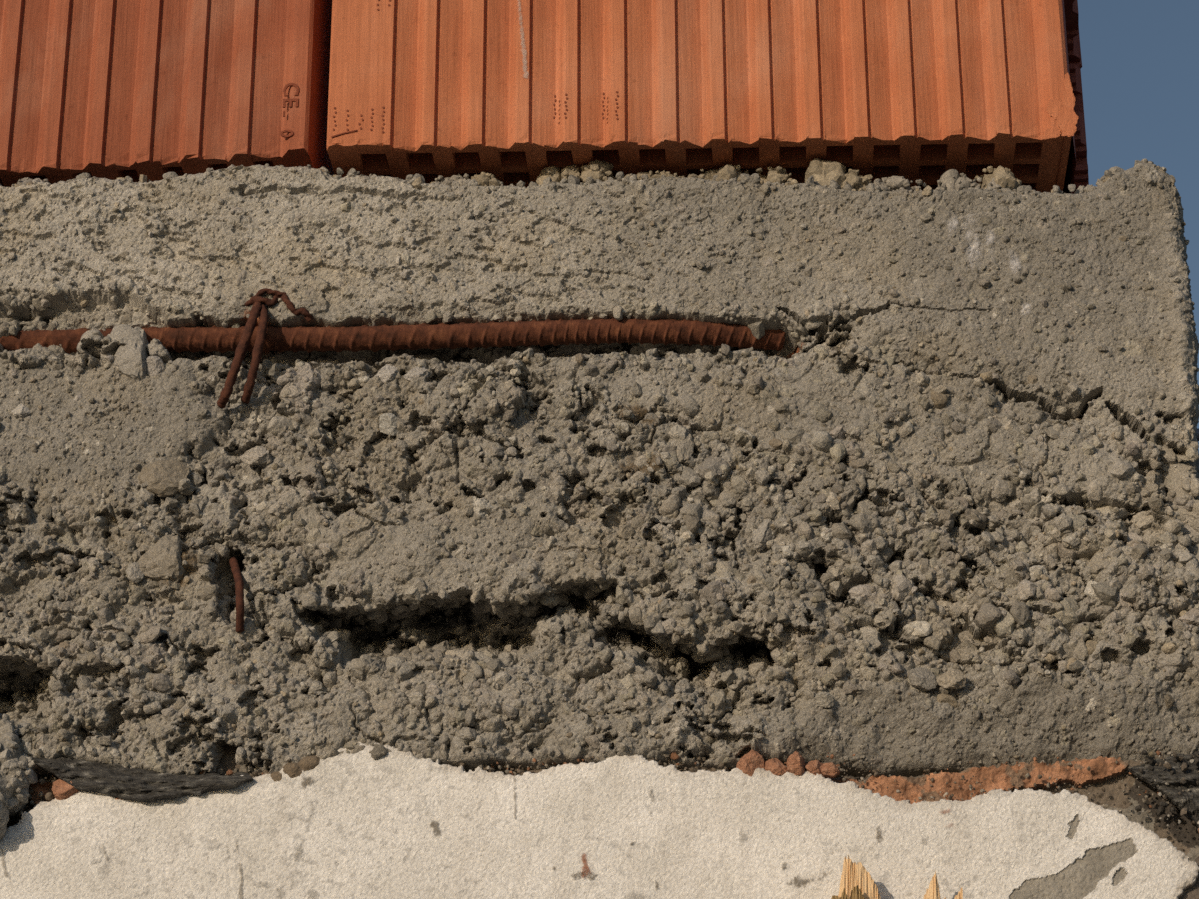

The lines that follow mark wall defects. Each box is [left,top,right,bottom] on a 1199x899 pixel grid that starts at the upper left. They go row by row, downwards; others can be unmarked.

spalling [0,310,802,368]
crack [778,300,993,335]
crack [894,360,1153,476]
crack [1059,490,1126,514]